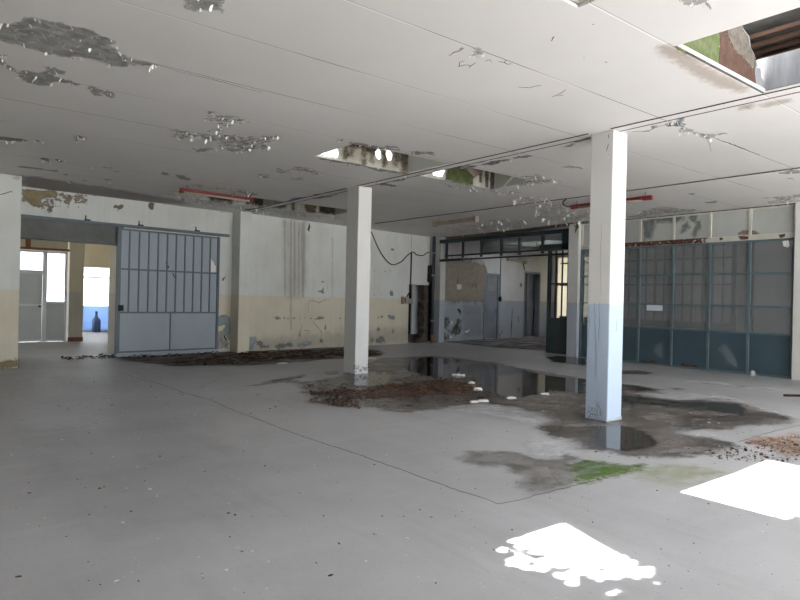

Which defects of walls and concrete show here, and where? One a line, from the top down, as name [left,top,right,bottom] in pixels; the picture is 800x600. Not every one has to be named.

peeling [184,0,225,13]
peeling [0,17,159,72]
peeling [0,55,115,98]
peeling [170,111,280,154]
peeling [651,118,727,142]
peeling [41,193,95,213]
peeling [440,175,590,228]